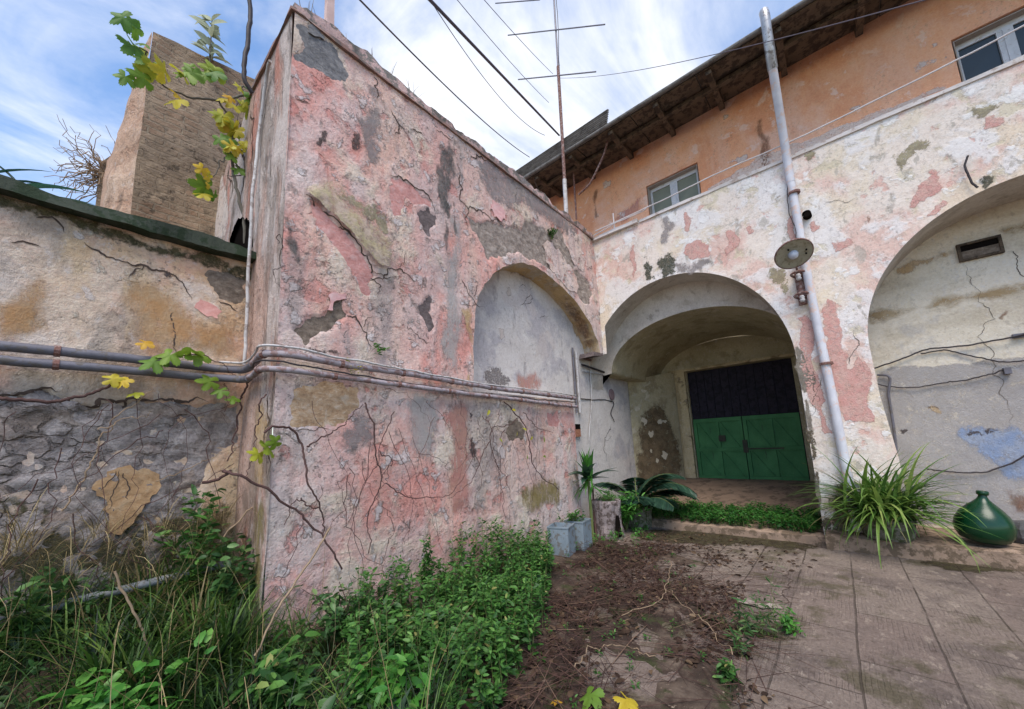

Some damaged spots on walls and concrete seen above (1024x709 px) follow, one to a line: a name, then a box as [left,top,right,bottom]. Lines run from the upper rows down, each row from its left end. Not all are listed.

spalling [293,24,349,82]
crack [374,77,547,226]
crack [36,216,190,295]
spalling [469,200,592,304]
spalling [294,292,346,345]
crack [965,265,1012,429]
crack [0,387,56,397]
crack [85,397,208,409]
crack [263,396,271,479]
peeling [795,299,875,532]
crack [101,471,133,508]